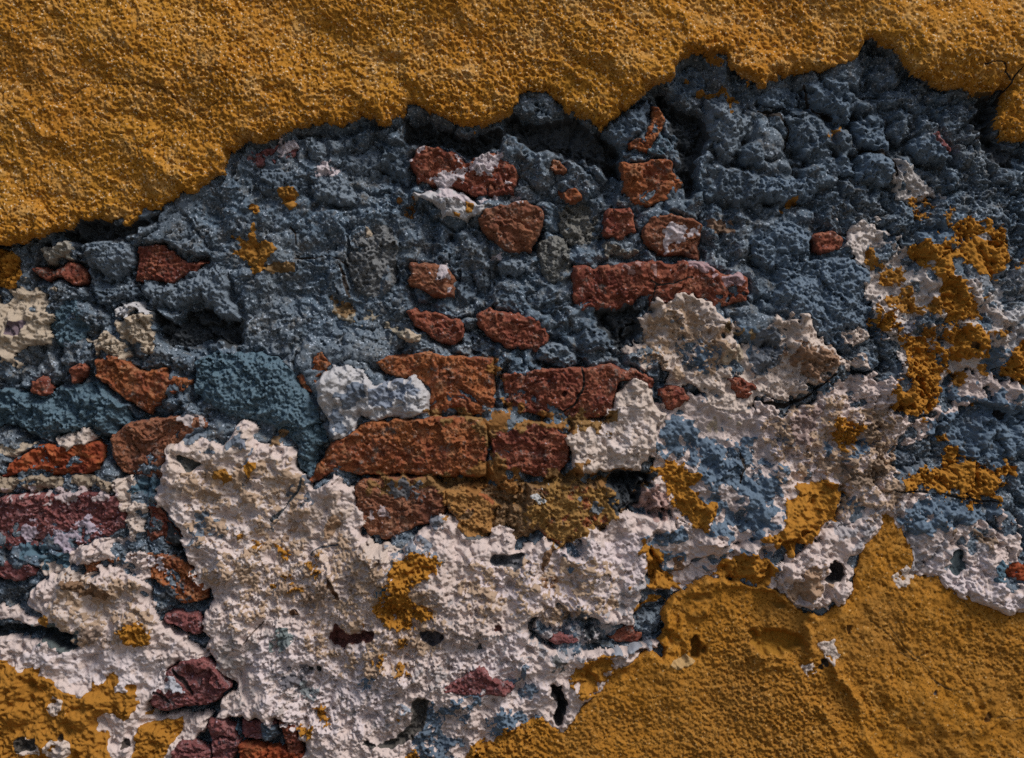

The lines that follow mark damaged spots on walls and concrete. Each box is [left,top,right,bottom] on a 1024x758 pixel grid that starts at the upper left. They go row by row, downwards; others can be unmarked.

peeling [684,79,739,114]
crack [974,60,1024,140]
peeling [0,159,1024,758]